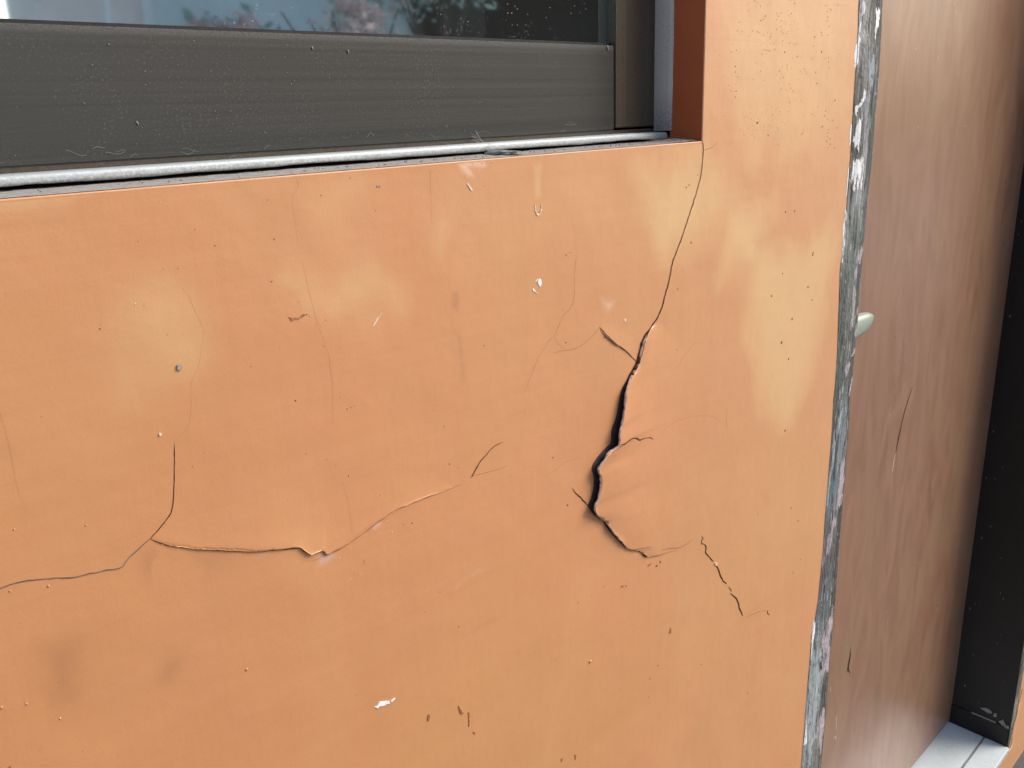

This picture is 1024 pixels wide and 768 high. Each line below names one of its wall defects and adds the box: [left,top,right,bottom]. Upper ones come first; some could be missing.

peeling [841,0,880,263]
crack [524,141,770,617]
peeling [845,247,863,396]
crack [0,410,506,589]
peeling [824,411,845,555]
peeling [803,610,837,768]